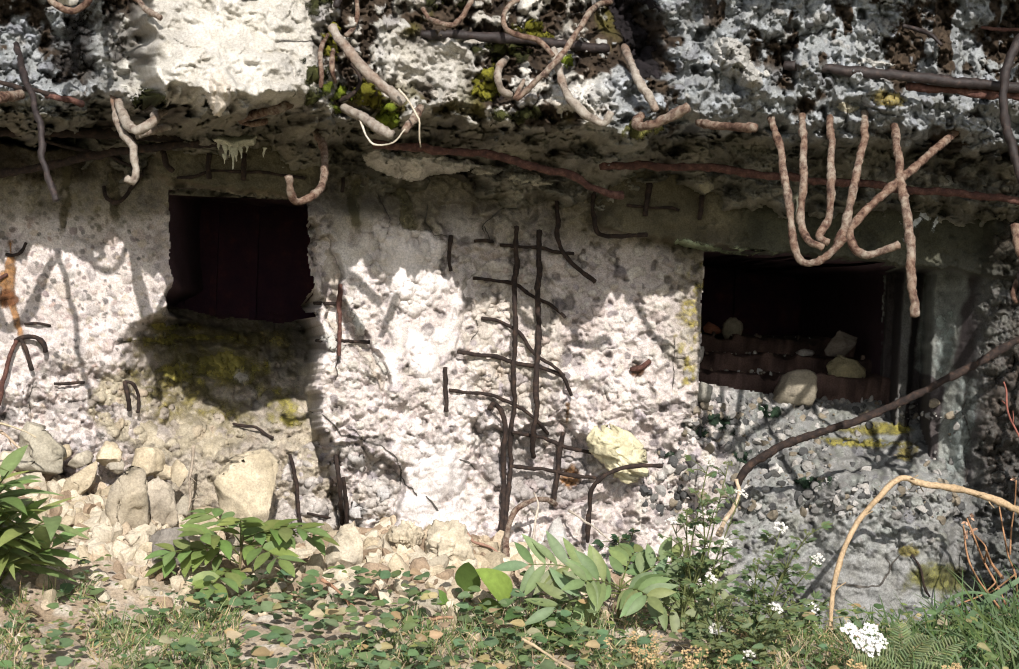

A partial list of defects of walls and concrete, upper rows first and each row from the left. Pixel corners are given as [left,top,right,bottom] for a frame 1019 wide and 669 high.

efflorescence [212,135,267,169]
spalling [362,150,553,186]
corrosion [0,240,23,336]
leakage [144,323,298,425]
spalling [461,259,591,510]
peeling [410,439,458,491]
corrosion [560,465,579,487]